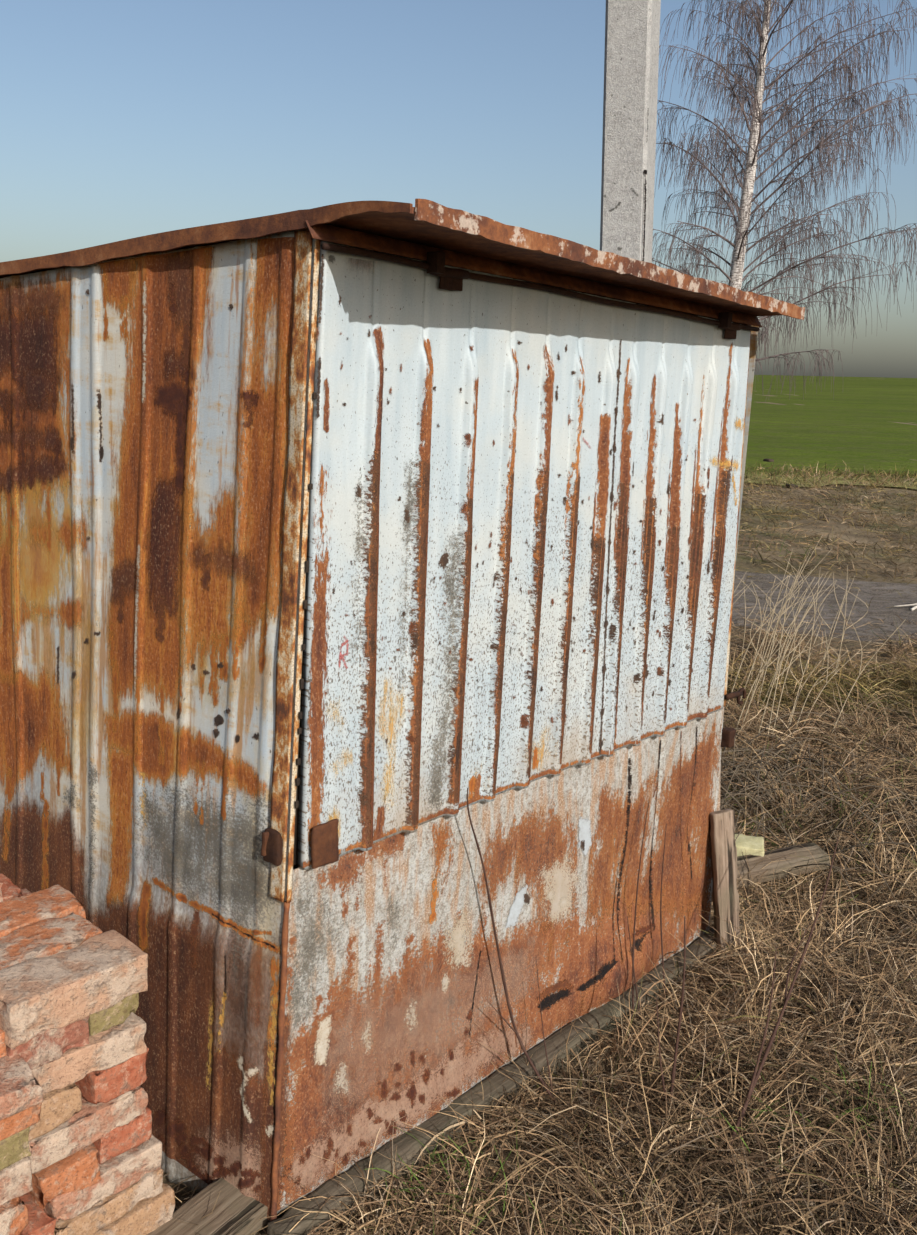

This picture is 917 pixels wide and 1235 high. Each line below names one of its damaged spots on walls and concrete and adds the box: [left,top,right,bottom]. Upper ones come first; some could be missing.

rust [0,237,745,1220]